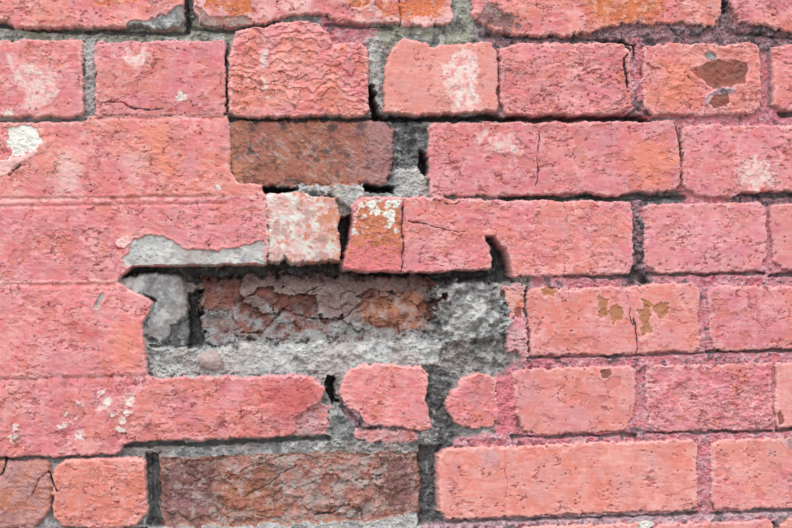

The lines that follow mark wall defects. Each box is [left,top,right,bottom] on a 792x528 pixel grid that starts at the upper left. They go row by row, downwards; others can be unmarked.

peeling [116,44,157,80]
peeling [175,90,187,102]
peeling [257,34,275,110]
peeling [702,50,748,109]
crack [533,131,541,186]
crack [673,99,692,162]
spalling [121,120,449,379]
peeling [597,295,624,325]
peeling [636,298,670,336]
spalling [153,445,428,528]